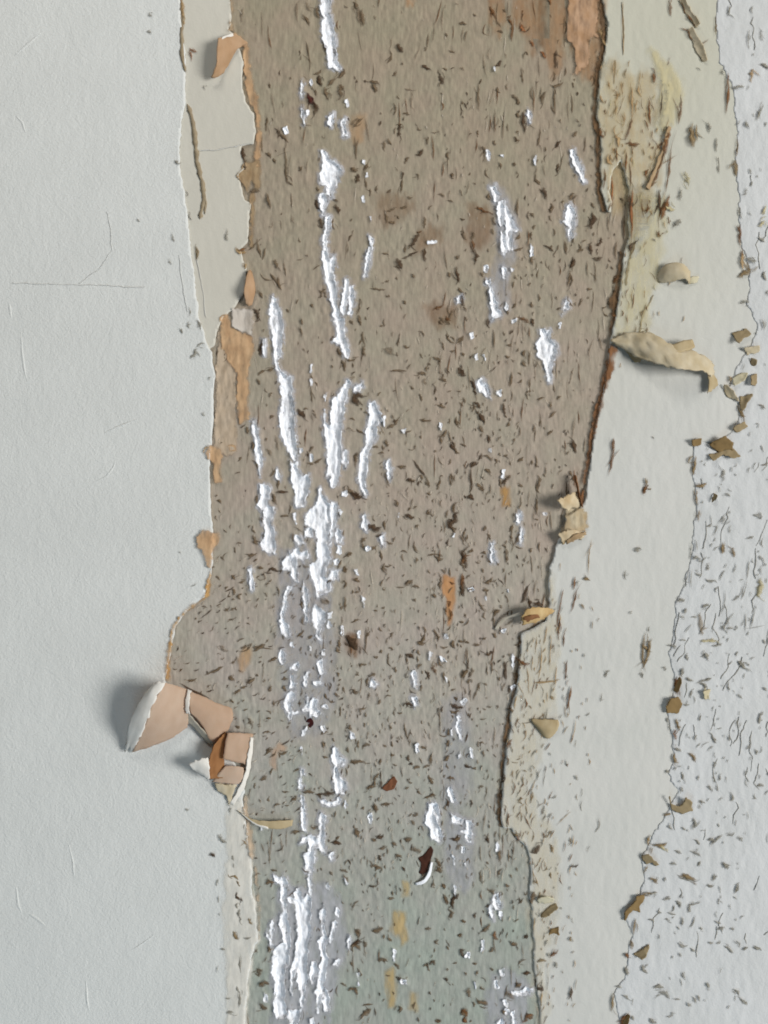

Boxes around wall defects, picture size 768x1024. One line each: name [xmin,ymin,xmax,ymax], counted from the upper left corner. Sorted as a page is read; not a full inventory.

spalling [319,0,342,72]
spalling [318,150,356,359]
spalling [483,182,519,324]
spalling [560,201,578,241]
peeling [599,61,760,461]
spalling [535,297,571,384]
peeling [557,475,583,511]
spalling [249,294,386,1024]
spalling [415,785,474,885]
water stain [502,619,557,906]
peeling [494,529,599,1024]
water stain [270,884,346,1024]